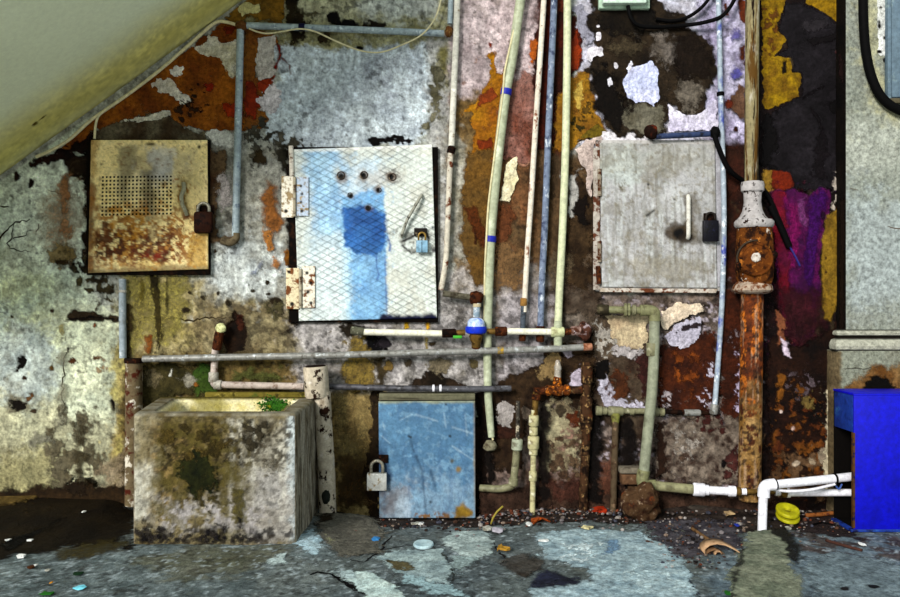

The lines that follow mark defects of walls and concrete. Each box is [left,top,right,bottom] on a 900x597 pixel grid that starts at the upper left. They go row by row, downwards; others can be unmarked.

peeling [464,43,504,160]
peeling [529,4,667,197]
crack [0,206,39,252]
peeling [28,0,291,335]
peeling [500,157,531,202]
water stain [116,275,191,359]
flaking render [264,280,300,334]
flaking render [483,283,649,494]
rust [657,288,740,419]
water stain [0,384,283,560]